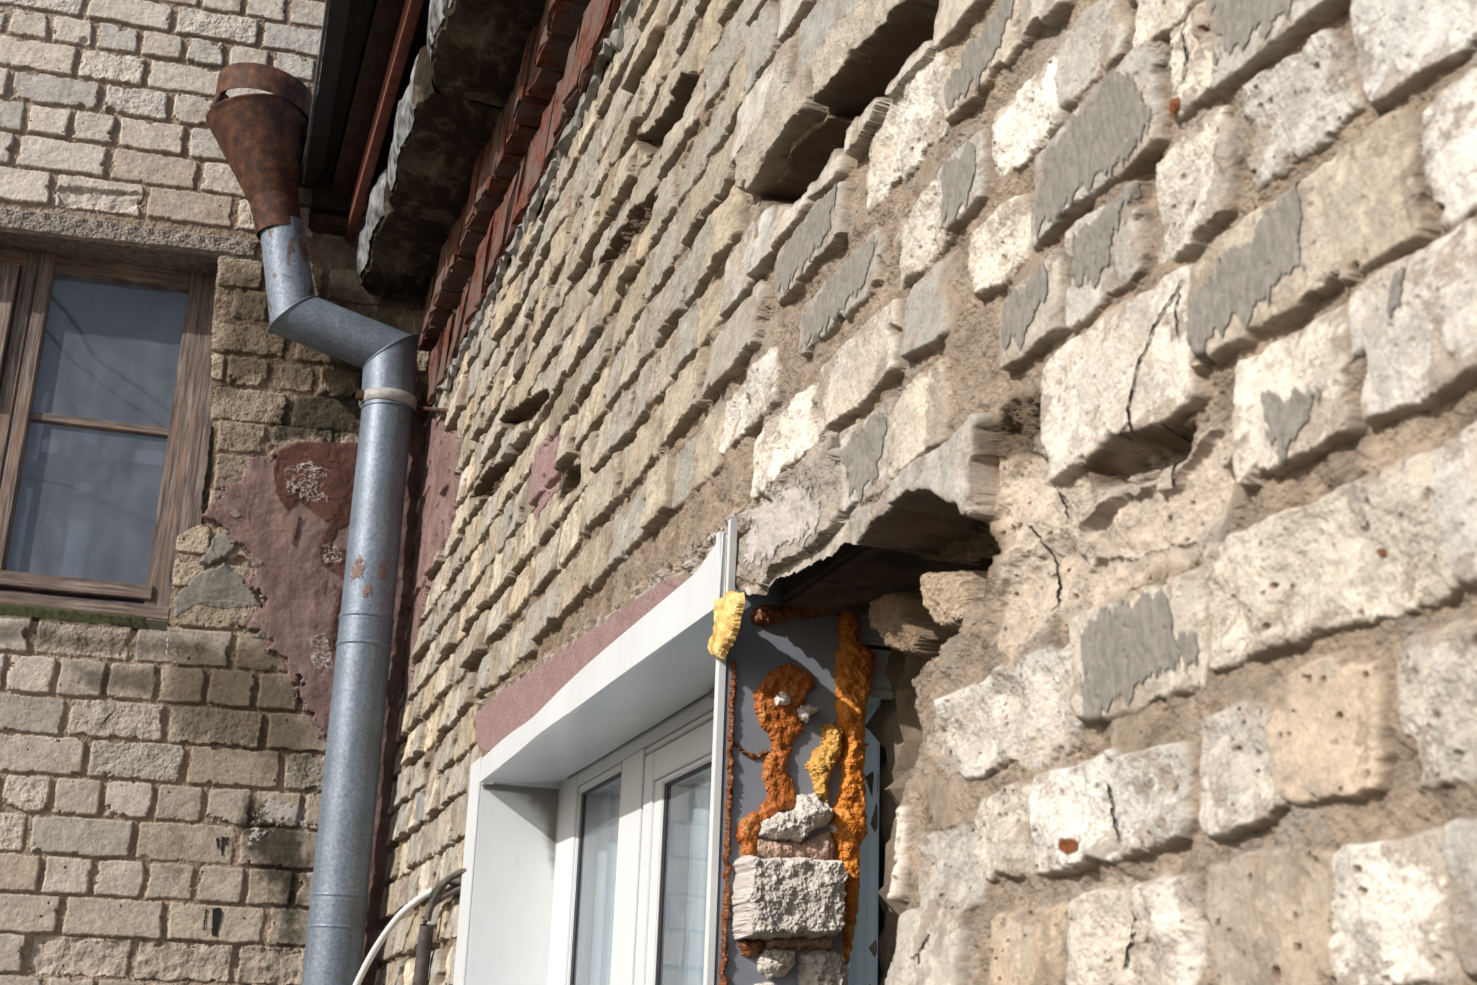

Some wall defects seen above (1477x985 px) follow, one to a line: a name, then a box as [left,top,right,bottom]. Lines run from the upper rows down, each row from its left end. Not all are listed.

leakage [273,441,358,671]
flaking render [202,400,463,985]
leakage [216,793,308,857]